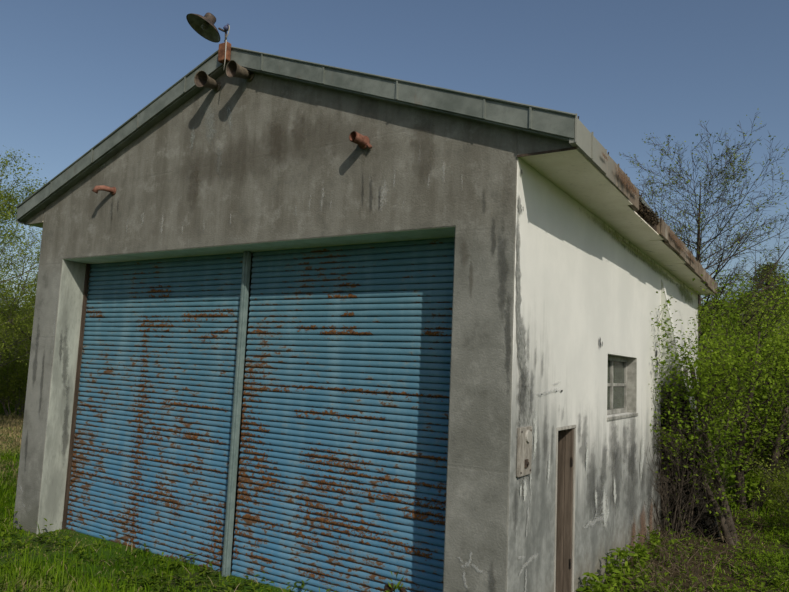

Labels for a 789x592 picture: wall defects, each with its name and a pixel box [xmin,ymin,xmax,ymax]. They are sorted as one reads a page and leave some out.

corrosion [615,167,638,196]
corrosion [146,284,172,301]
corrosion [297,311,373,339]
corrosion [66,308,238,548]
corrosion [233,359,447,564]
corrosion [195,499,225,572]
corrosion [296,567,334,585]